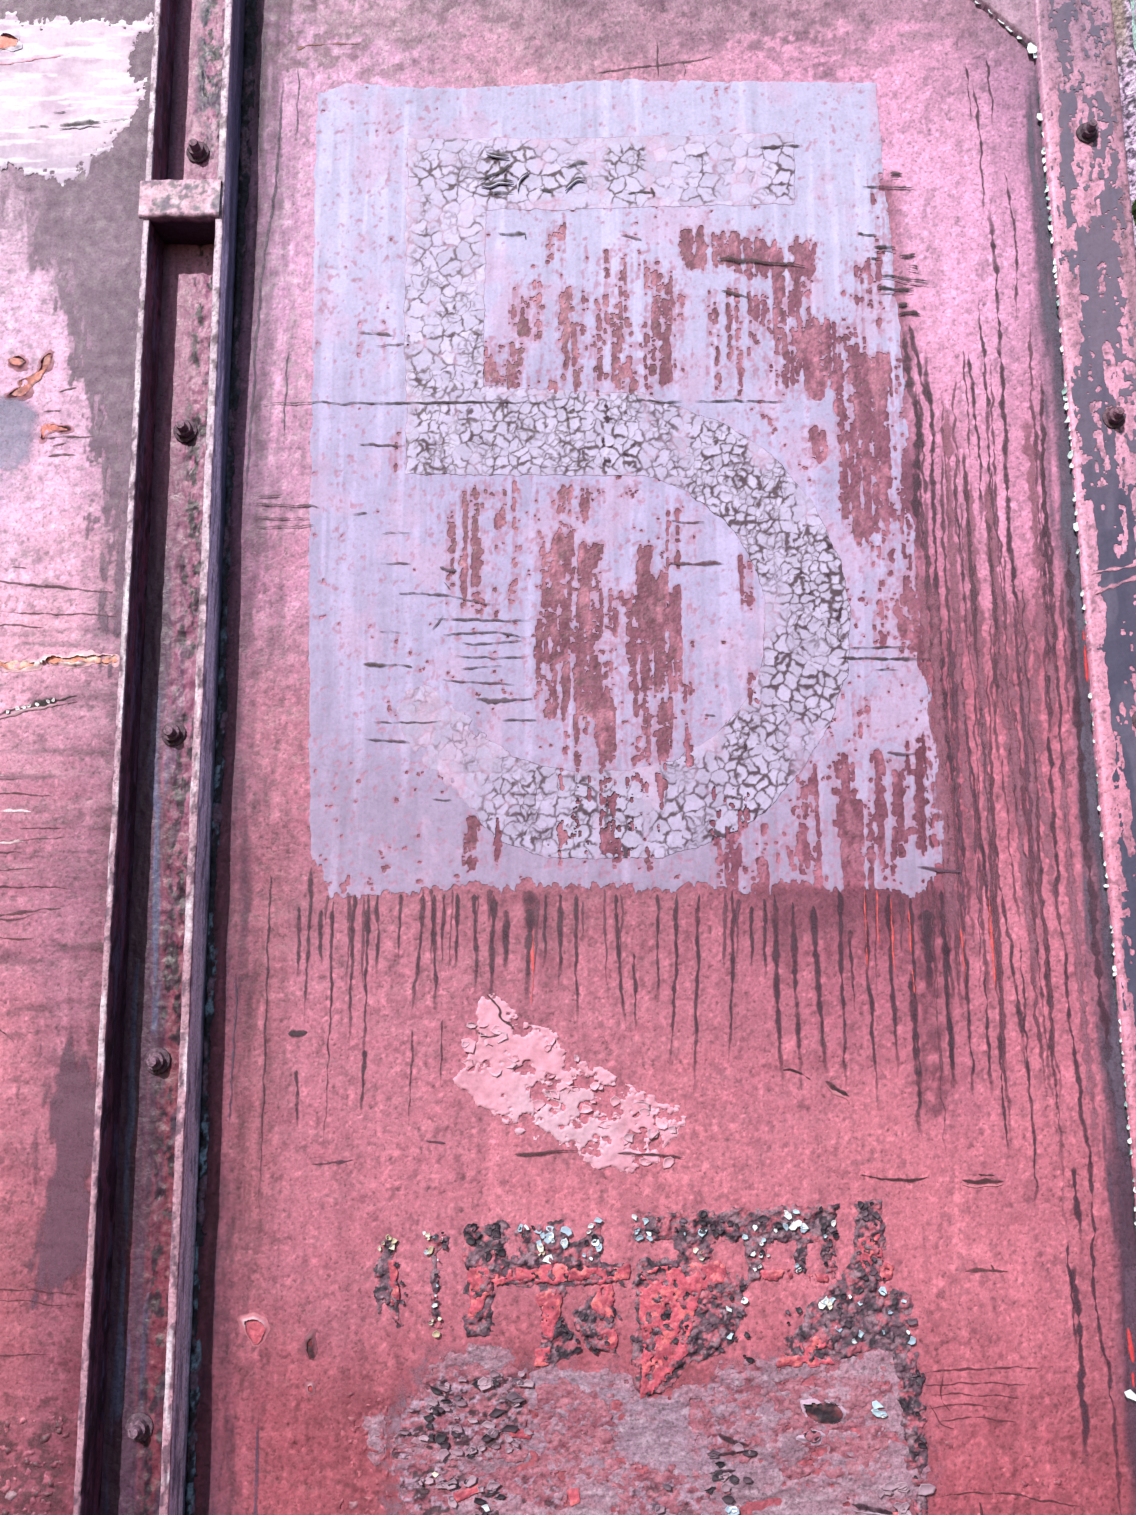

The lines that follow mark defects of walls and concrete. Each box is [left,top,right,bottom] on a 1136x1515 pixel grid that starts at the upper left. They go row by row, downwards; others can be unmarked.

damp [965,60,994,198]
peeling [4,349,54,401]
crack [253,132,928,860]
peeling [1043,0,1136,1027]
damp [297,868,584,1122]
peeling [453,993,686,1174]
damp [603,888,638,1020]
damp [656,894,700,1056]
damp [722,175,1119,1476]
crack [918,865,961,873]
peeling [373,1234,406,1328]
peeling [398,1198,936,1515]